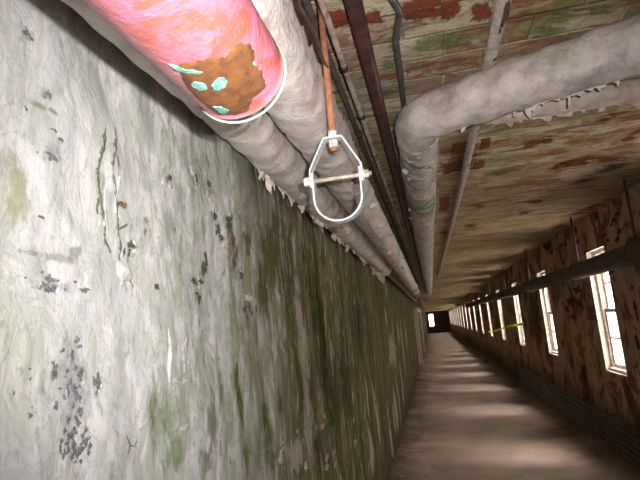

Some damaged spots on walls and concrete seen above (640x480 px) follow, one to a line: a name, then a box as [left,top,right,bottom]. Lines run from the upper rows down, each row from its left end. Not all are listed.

peeling [403,0,461,24]
peeling [471,2,491,22]
peeling [429,137,491,174]
peeling [188,165,244,280]
spalling [38,271,66,294]
spalling [191,252,208,304]
water stain [255,270,269,318]
spalling [48,337,103,464]
water stain [269,259,322,480]
water stain [364,373,382,478]
water stain [384,307,408,459]